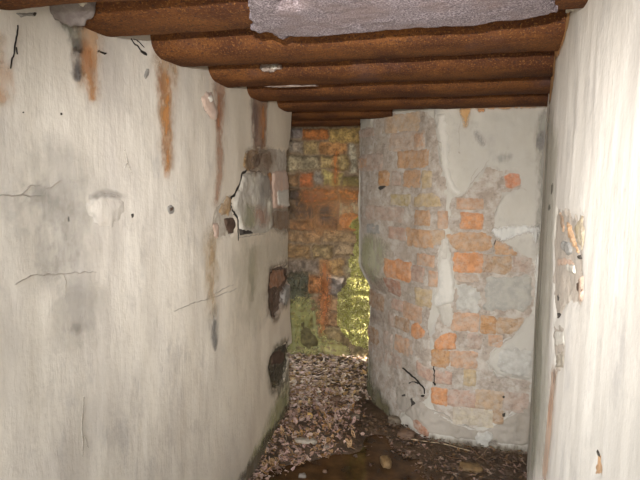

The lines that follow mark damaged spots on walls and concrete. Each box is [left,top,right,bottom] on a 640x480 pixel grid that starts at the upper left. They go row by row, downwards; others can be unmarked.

rust [248,0,558,40]
crack [10,25,19,69]
rust [259,64,282,72]
rust [159,60,177,167]
rust [251,99,268,150]
crack [0,180,62,198]
crack [15,271,97,297]
spalling [268,263,291,321]
spalling [358,111,536,447]
spalling [552,208,585,317]
spalling [268,339,289,392]
crack [402,366,512,432]